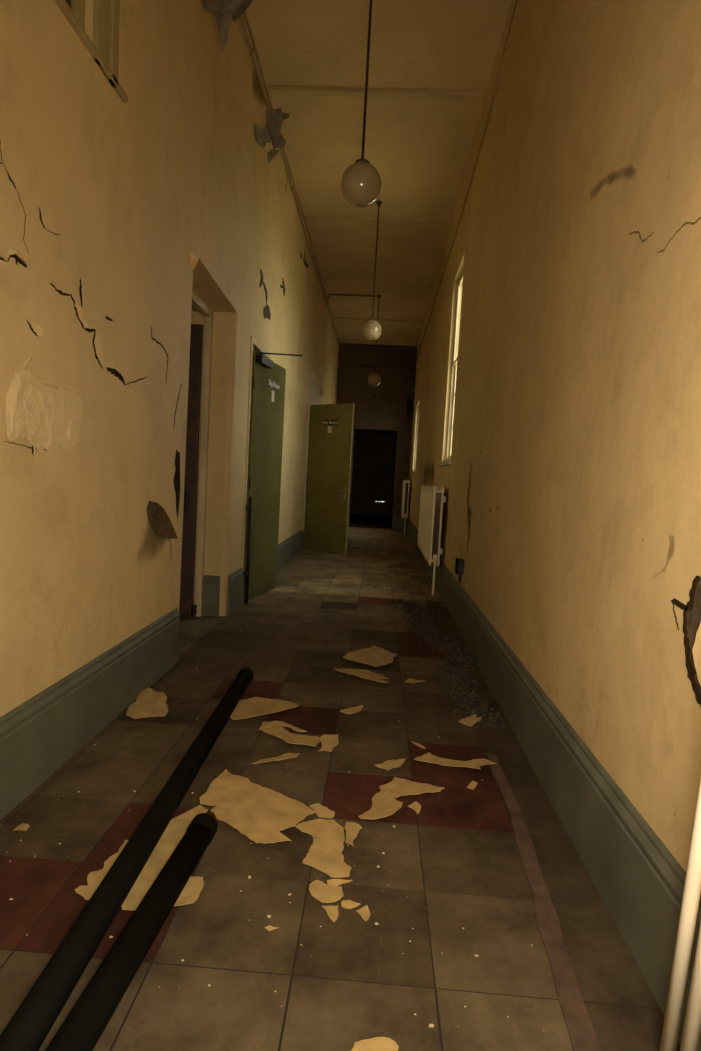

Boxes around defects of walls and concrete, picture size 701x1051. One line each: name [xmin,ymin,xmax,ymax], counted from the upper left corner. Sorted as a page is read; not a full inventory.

peeling [202,0,253,51]
peeling [254,107,290,164]
crack [0,141,61,267]
crack [628,217,701,253]
crack [27,320,43,337]
crack [50,279,182,426]
peeling [671,576,701,707]